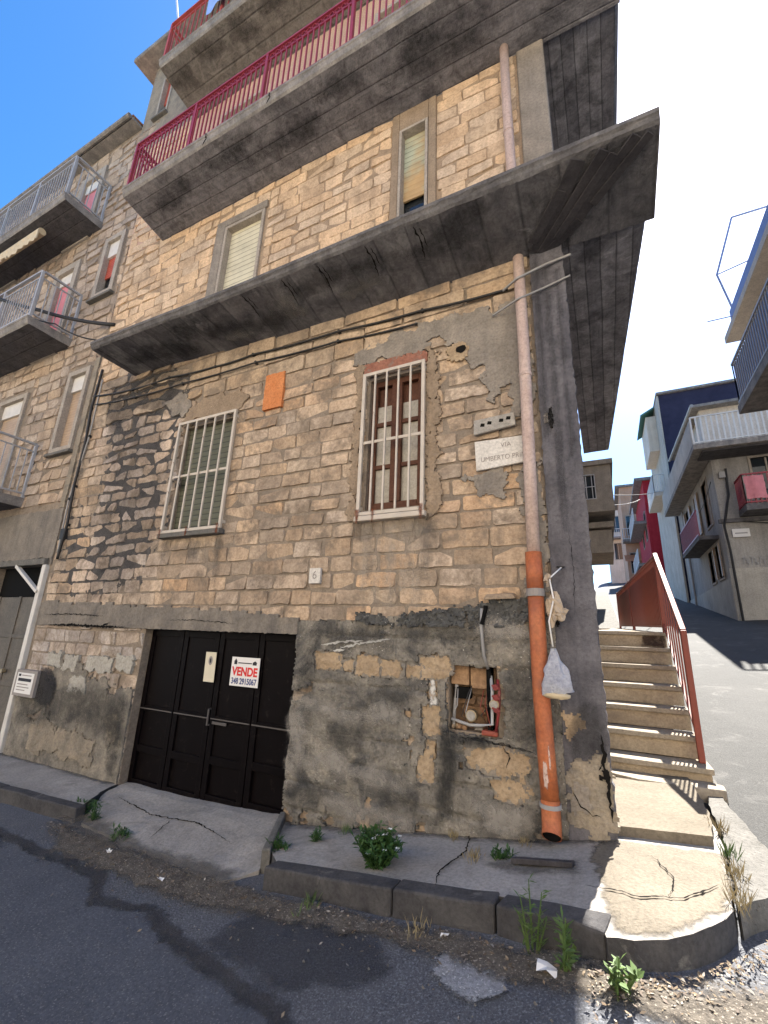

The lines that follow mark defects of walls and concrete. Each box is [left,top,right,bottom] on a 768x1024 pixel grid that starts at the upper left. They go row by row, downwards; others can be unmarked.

crack [413,227,428,257]
peeling [344,297,537,523]
peeling [50,368,195,597]
leakage [321,639,387,652]
leakage [288,698,397,786]
peeling [561,710,586,741]
crack [123,799,230,842]
spalling [462,743,551,808]
peeling [565,750,621,842]
crack [573,736,614,821]
crack [436,836,470,883]
crack [588,858,717,898]